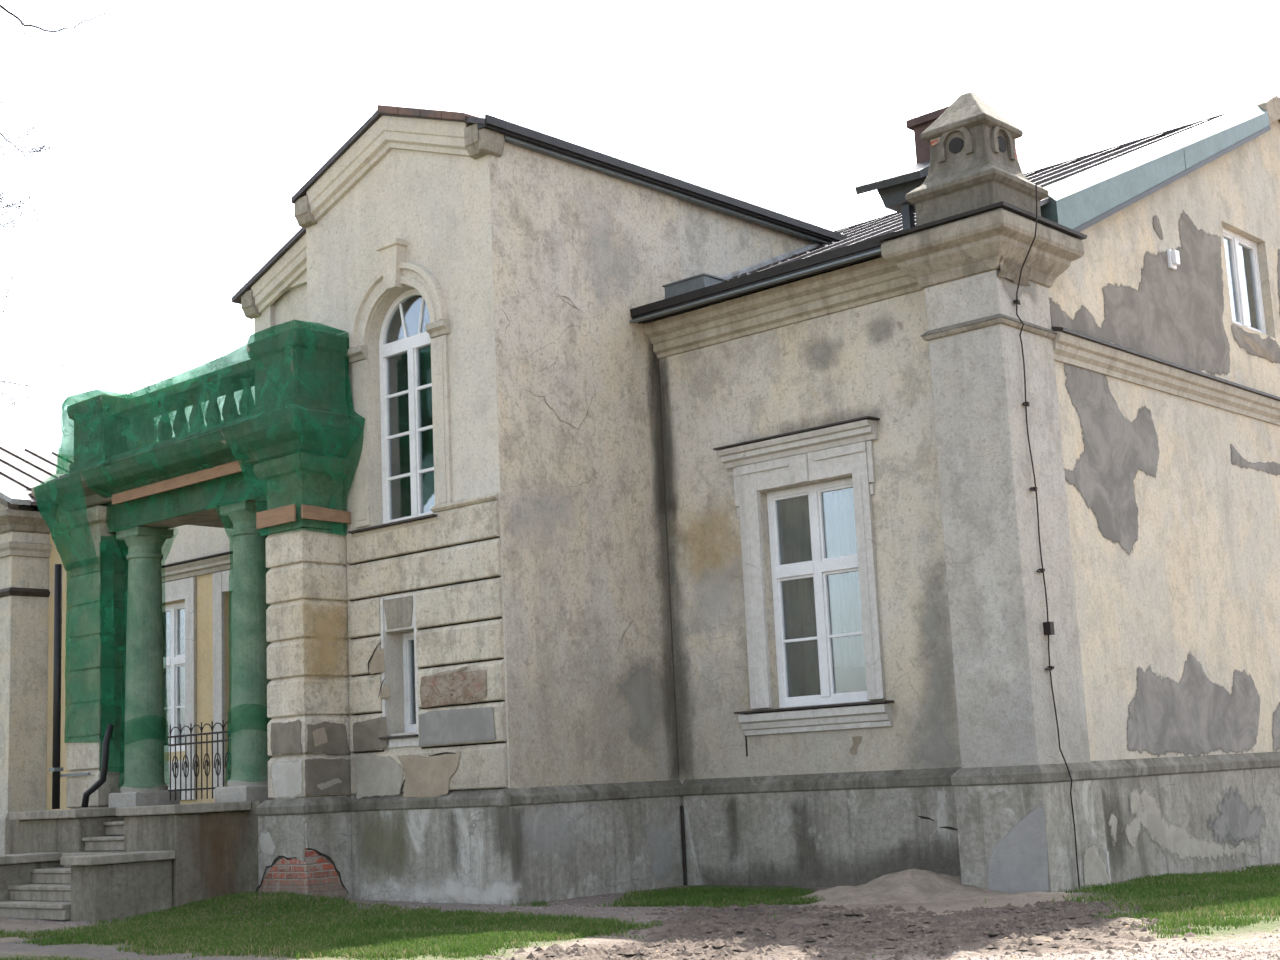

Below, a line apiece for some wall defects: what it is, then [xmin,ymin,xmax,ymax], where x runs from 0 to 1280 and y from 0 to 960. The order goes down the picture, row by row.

peeling [1153,216,1163,240]
peeling [1239,332,1275,363]
damp [620,352,686,772]
flaking render [255,848,349,899]
damp [396,810,520,905]
damp [720,808,961,887]
peeling [1084,789,1246,888]